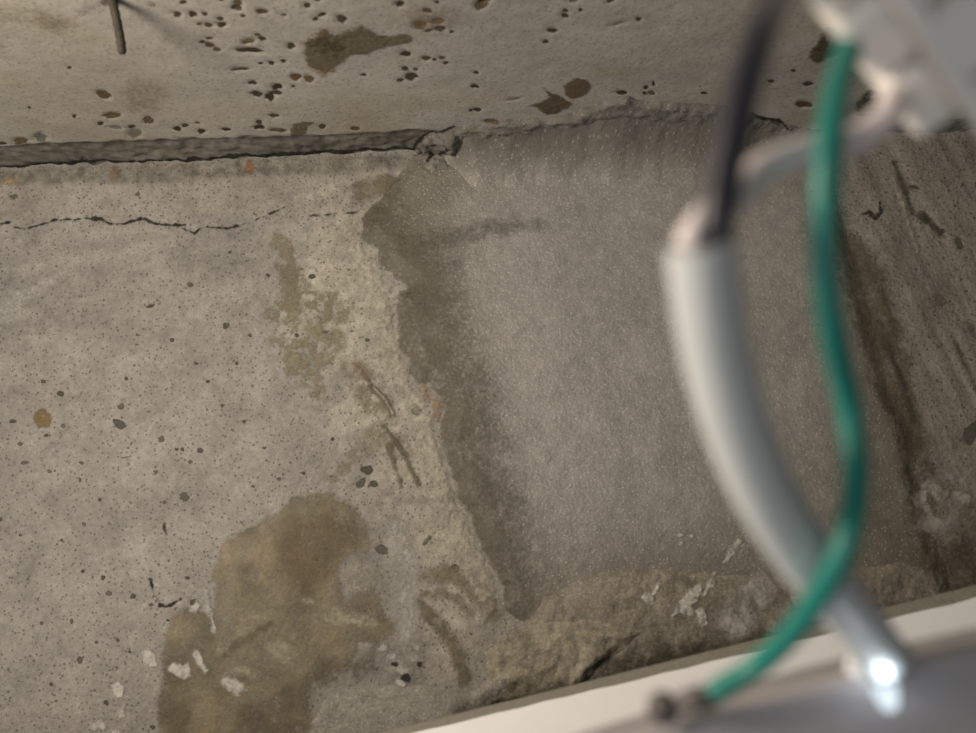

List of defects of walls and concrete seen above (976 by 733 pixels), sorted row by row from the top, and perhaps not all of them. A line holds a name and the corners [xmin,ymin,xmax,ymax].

crack [0,126,455,168]
crack [0,207,284,234]
rust [33,409,51,427]
leakage [158,493,400,733]